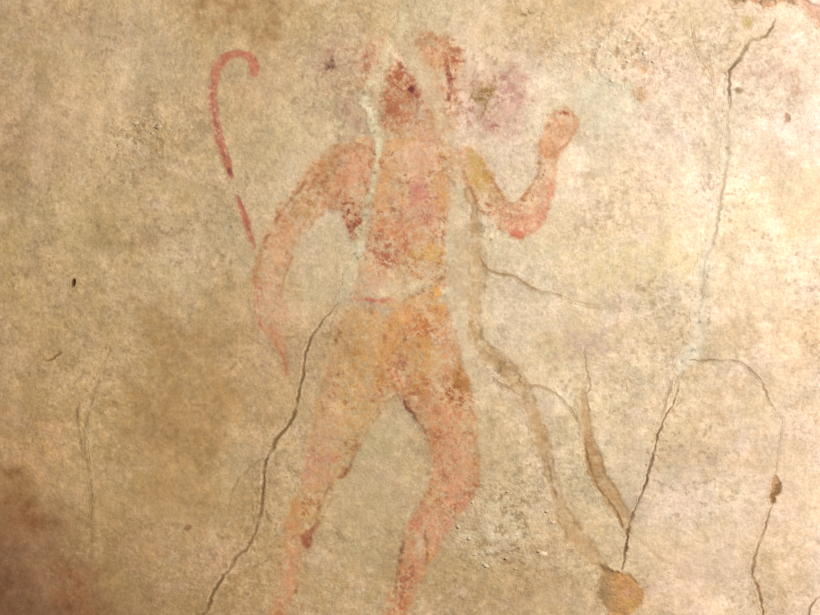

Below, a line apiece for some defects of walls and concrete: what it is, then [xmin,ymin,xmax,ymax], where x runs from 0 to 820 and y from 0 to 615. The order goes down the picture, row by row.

crack [198,0,787,615]
crack [808,596,820,615]